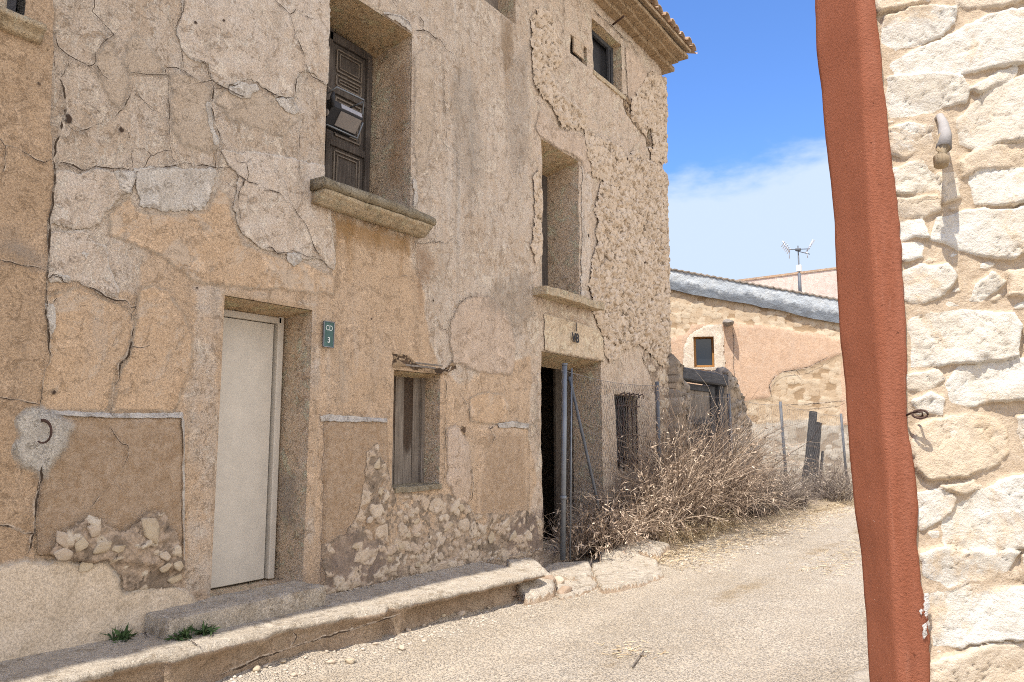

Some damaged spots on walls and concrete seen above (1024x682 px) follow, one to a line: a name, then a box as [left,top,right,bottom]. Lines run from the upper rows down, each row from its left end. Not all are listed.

crack [0,0,336,507]
spalling [530,7,672,457]
crack [0,467,43,553]
spalling [50,511,186,592]
spalling [321,443,547,594]